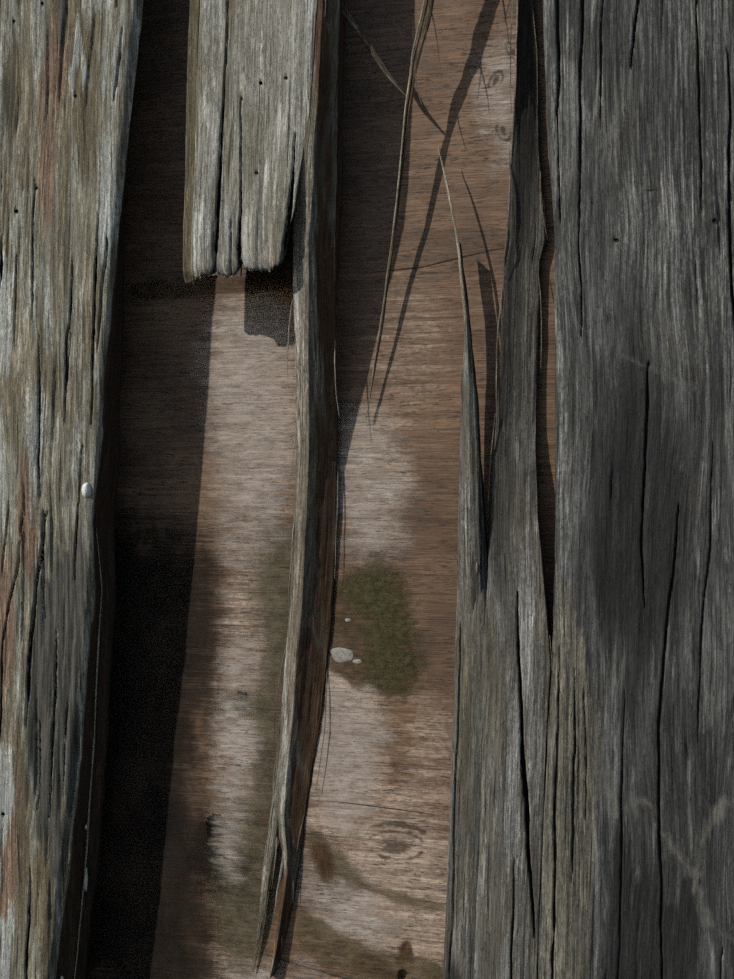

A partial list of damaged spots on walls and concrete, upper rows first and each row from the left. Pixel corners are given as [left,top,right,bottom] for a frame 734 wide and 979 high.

crack [556,0,604,335]
crack [631,0,640,65]
water stain [297,834,444,979]
crack [510,610,587,979]